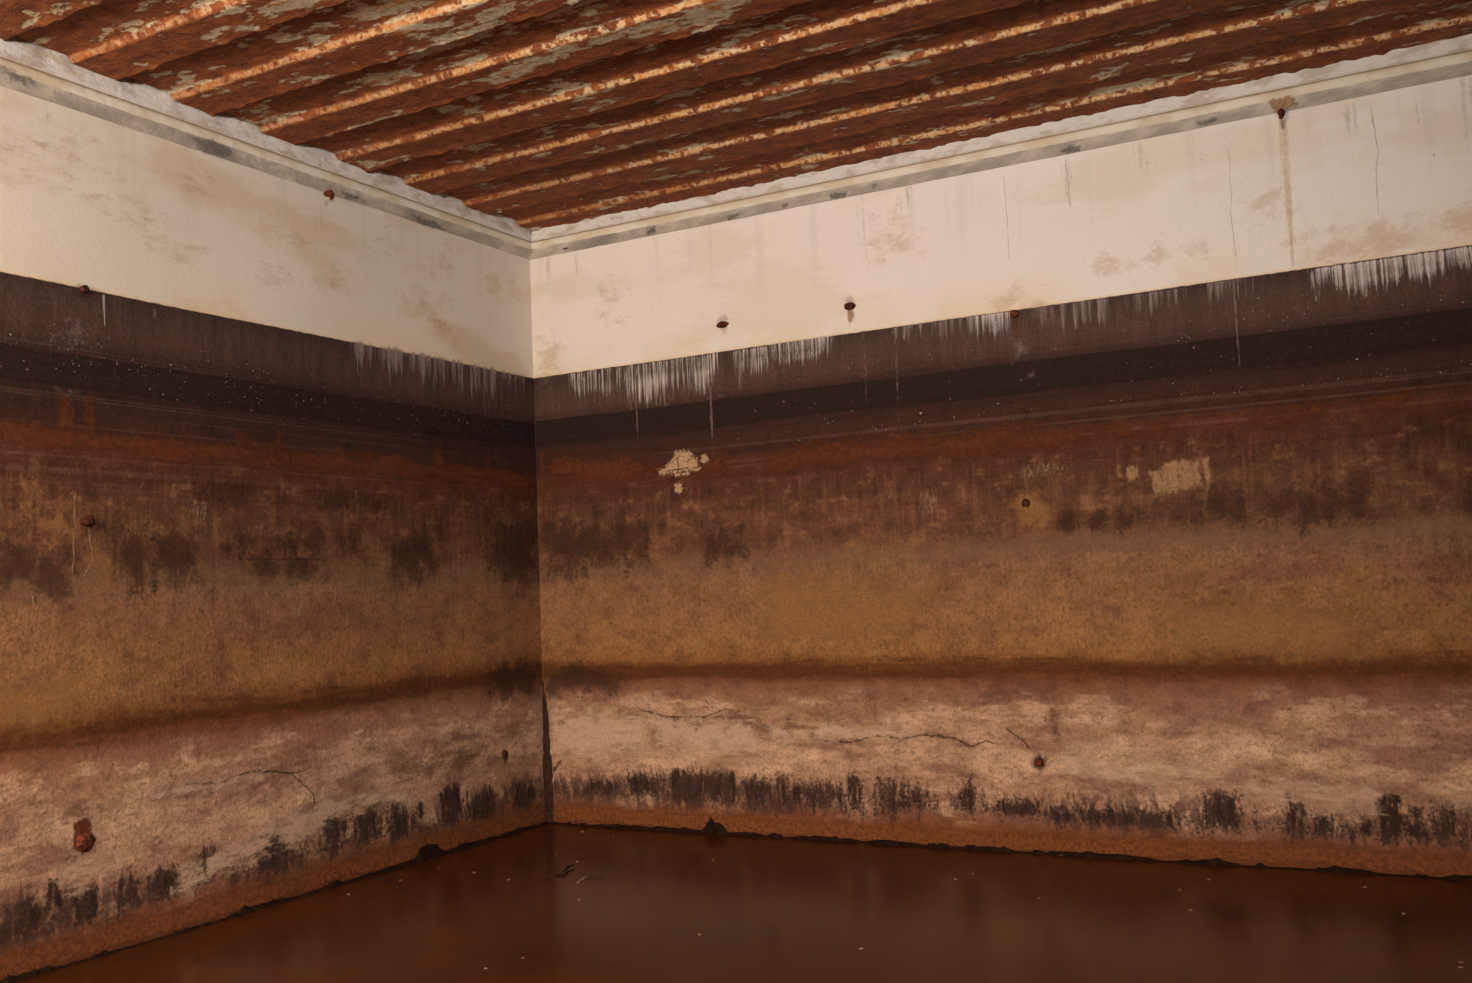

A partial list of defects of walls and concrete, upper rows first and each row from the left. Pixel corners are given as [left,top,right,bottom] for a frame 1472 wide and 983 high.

water stain [1311,246,1472,296]
water stain [0,308,1472,449]
peeling [658,449,709,495]
corrosion [697,452,728,474]
peeling [1117,458,1211,495]
water stain [0,744,1472,945]
corrosion [0,803,1472,977]